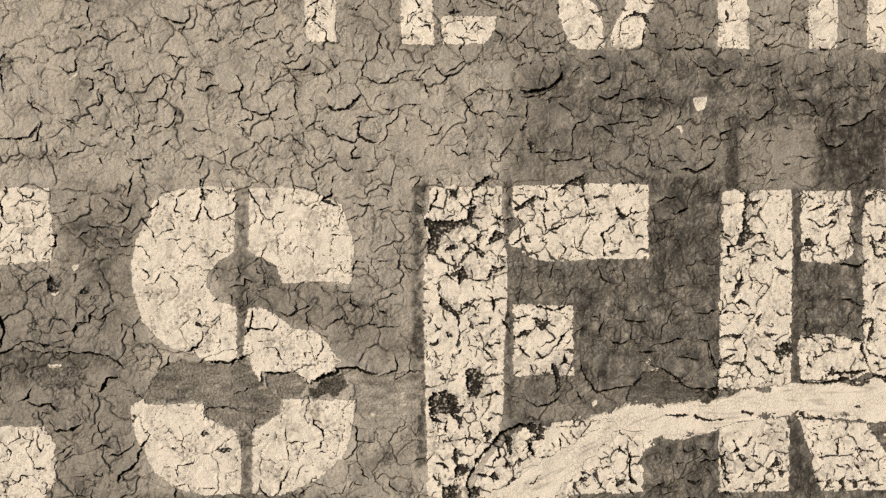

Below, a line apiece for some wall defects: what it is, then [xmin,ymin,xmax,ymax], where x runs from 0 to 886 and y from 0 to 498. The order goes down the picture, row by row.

crack [0,0,822,404]
peeling [435,289,474,329]
peeling [417,187,539,285]
peeling [514,313,554,340]
peeling [735,190,763,264]
peeling [753,309,796,366]
crack [695,215,886,385]
crack [795,192,886,312]
crack [0,387,151,498]
peeling [437,414,548,498]
crack [431,380,562,498]
crack [599,413,784,498]